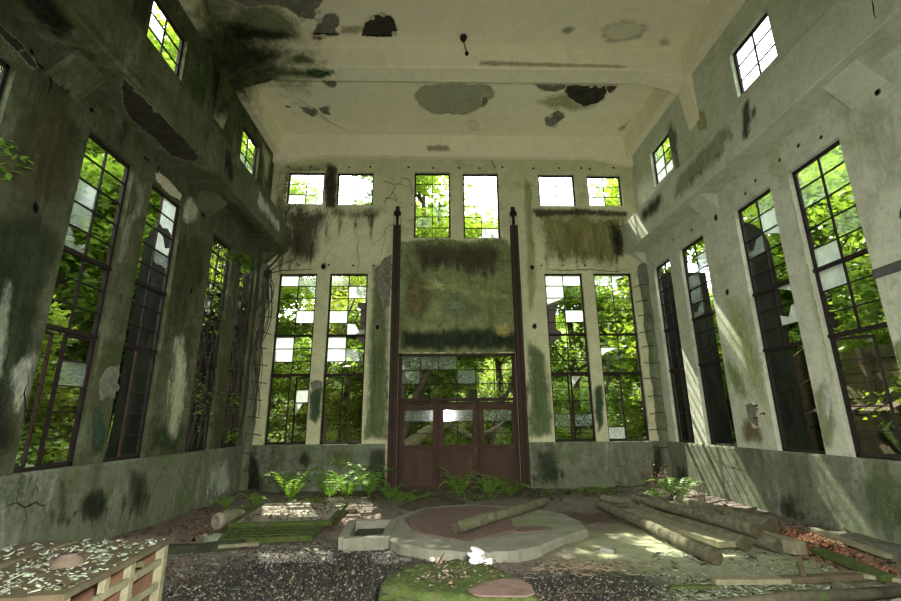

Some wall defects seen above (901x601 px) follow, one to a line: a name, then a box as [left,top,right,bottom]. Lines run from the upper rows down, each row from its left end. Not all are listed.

leakage [234,7,297,40]
flaking render [361,11,398,38]
leakage [275,51,329,77]
flaking render [534,83,618,107]
flaking render [544,110,565,128]
leakage [258,164,377,263]
leakage [525,183,627,301]
leakage [398,237,515,354]
leakage [364,267,388,439]
leakage [370,450,386,488]
crack [7,483,50,527]